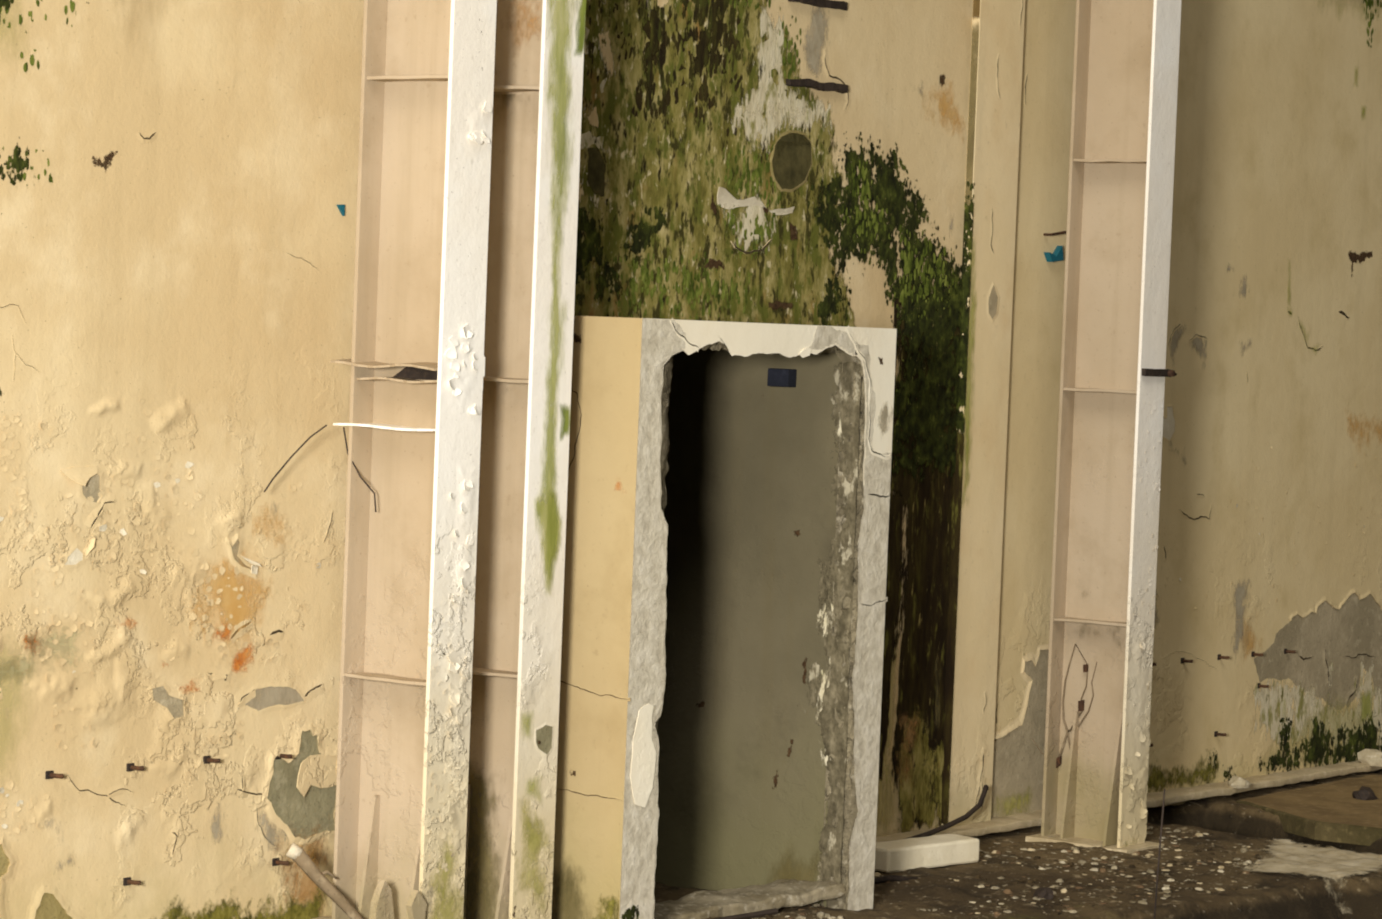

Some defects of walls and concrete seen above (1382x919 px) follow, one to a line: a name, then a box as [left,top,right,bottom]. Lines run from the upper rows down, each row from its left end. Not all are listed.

water stain [577,0,832,154]
water stain [561,407,570,437]
water stain [878,0,980,833]
spalling [0,404,338,849]
rust [204,562,266,638]
rust [233,647,251,670]
peeling [424,461,479,873]
water stain [536,495,559,574]
spalling [991,644,1049,818]
spalling [1253,587,1382,751]
spalling [0,780,90,919]